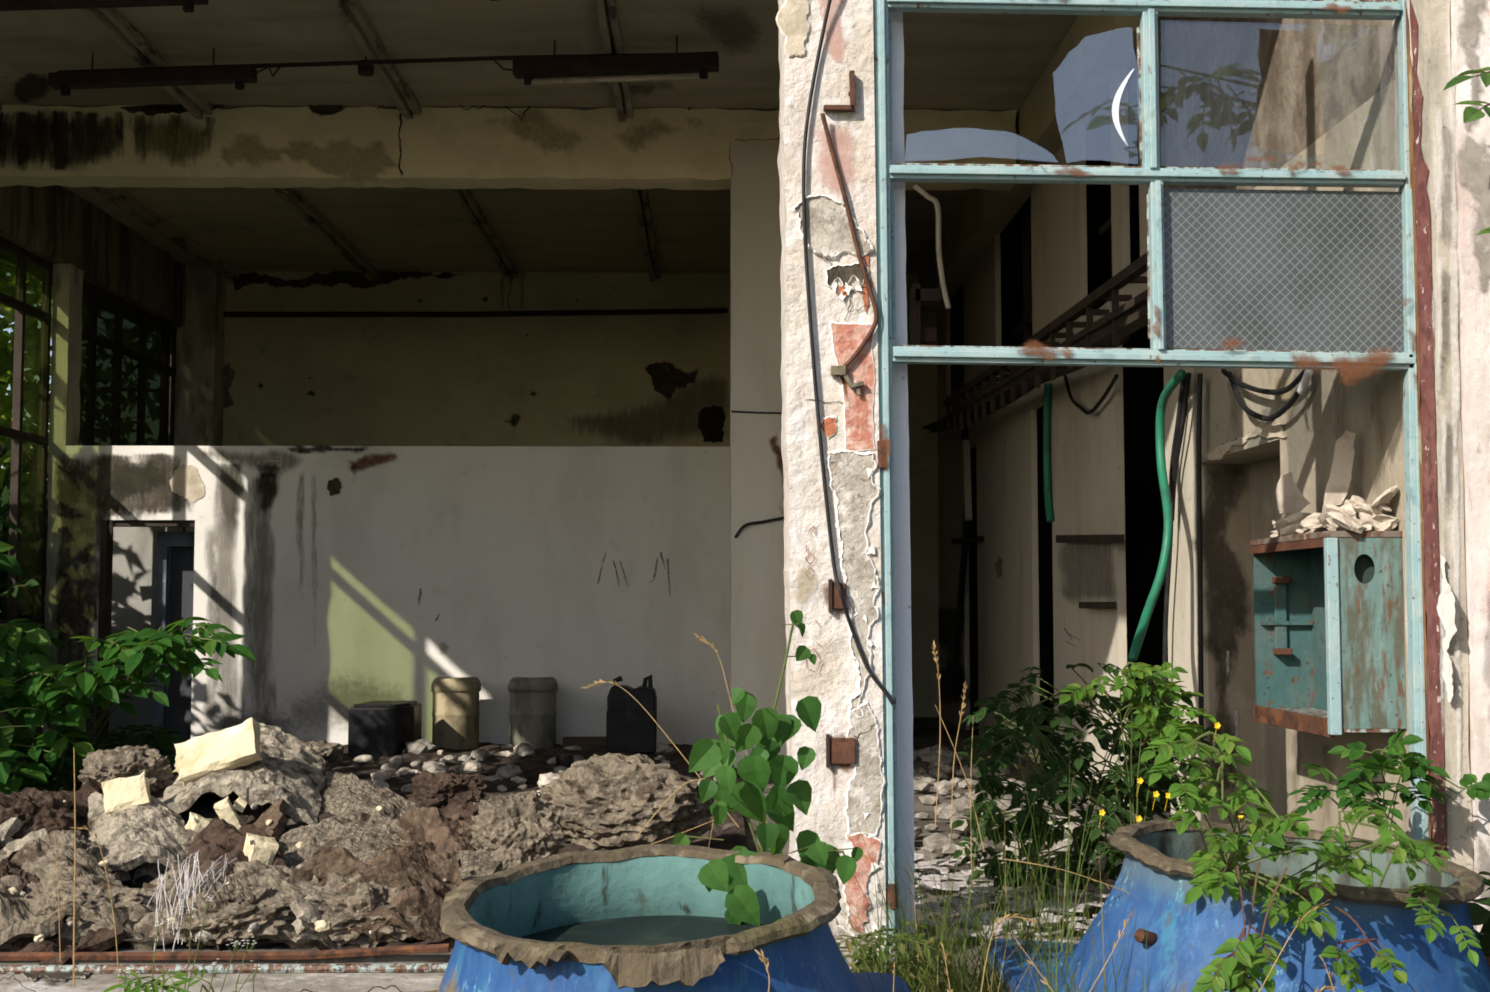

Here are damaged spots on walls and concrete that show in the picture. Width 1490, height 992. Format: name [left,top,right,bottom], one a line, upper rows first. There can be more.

flaking render [776,0,844,62]
corrosion [1324,3,1351,13]
water stain [0,73,212,170]
flaking render [643,360,699,402]
hole [697,405,726,443]
corrosion [1293,349,1393,383]
corrosion [1383,0,1430,775]
peeling [169,464,205,502]
water stain [55,453,190,675]
water stain [205,445,365,728]
flaking render [791,131,886,972]
water stain [1192,465,1247,790]